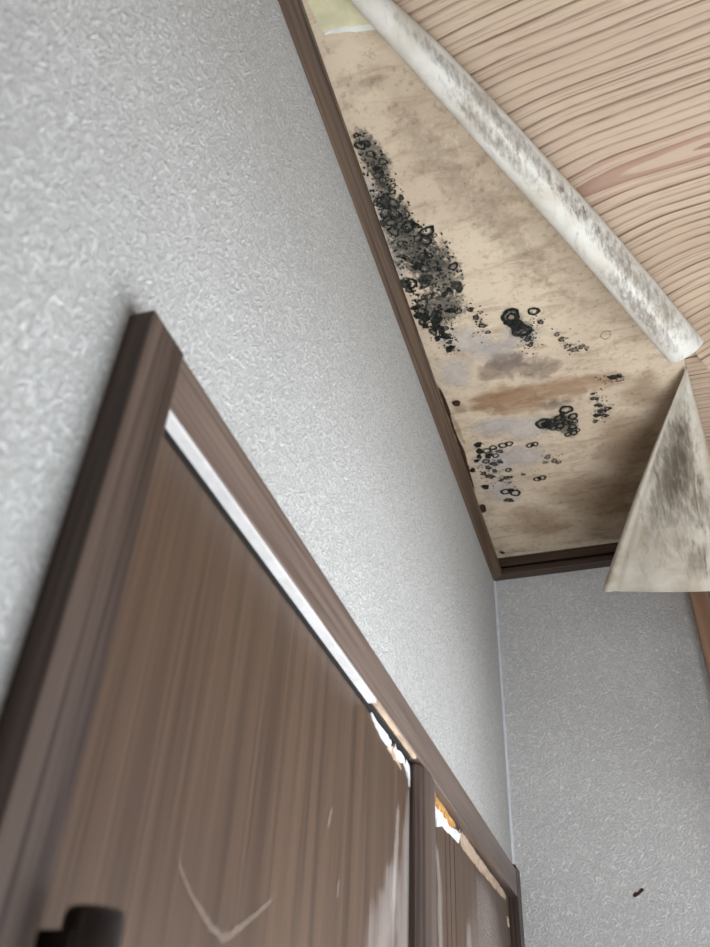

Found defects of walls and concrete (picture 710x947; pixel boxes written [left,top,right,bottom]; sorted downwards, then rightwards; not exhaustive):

leakage [353,126,508,383]
peeling [350,0,710,592]
leakage [501,308,589,355]
leakage [438,386,581,502]
leakage [590,373,630,423]